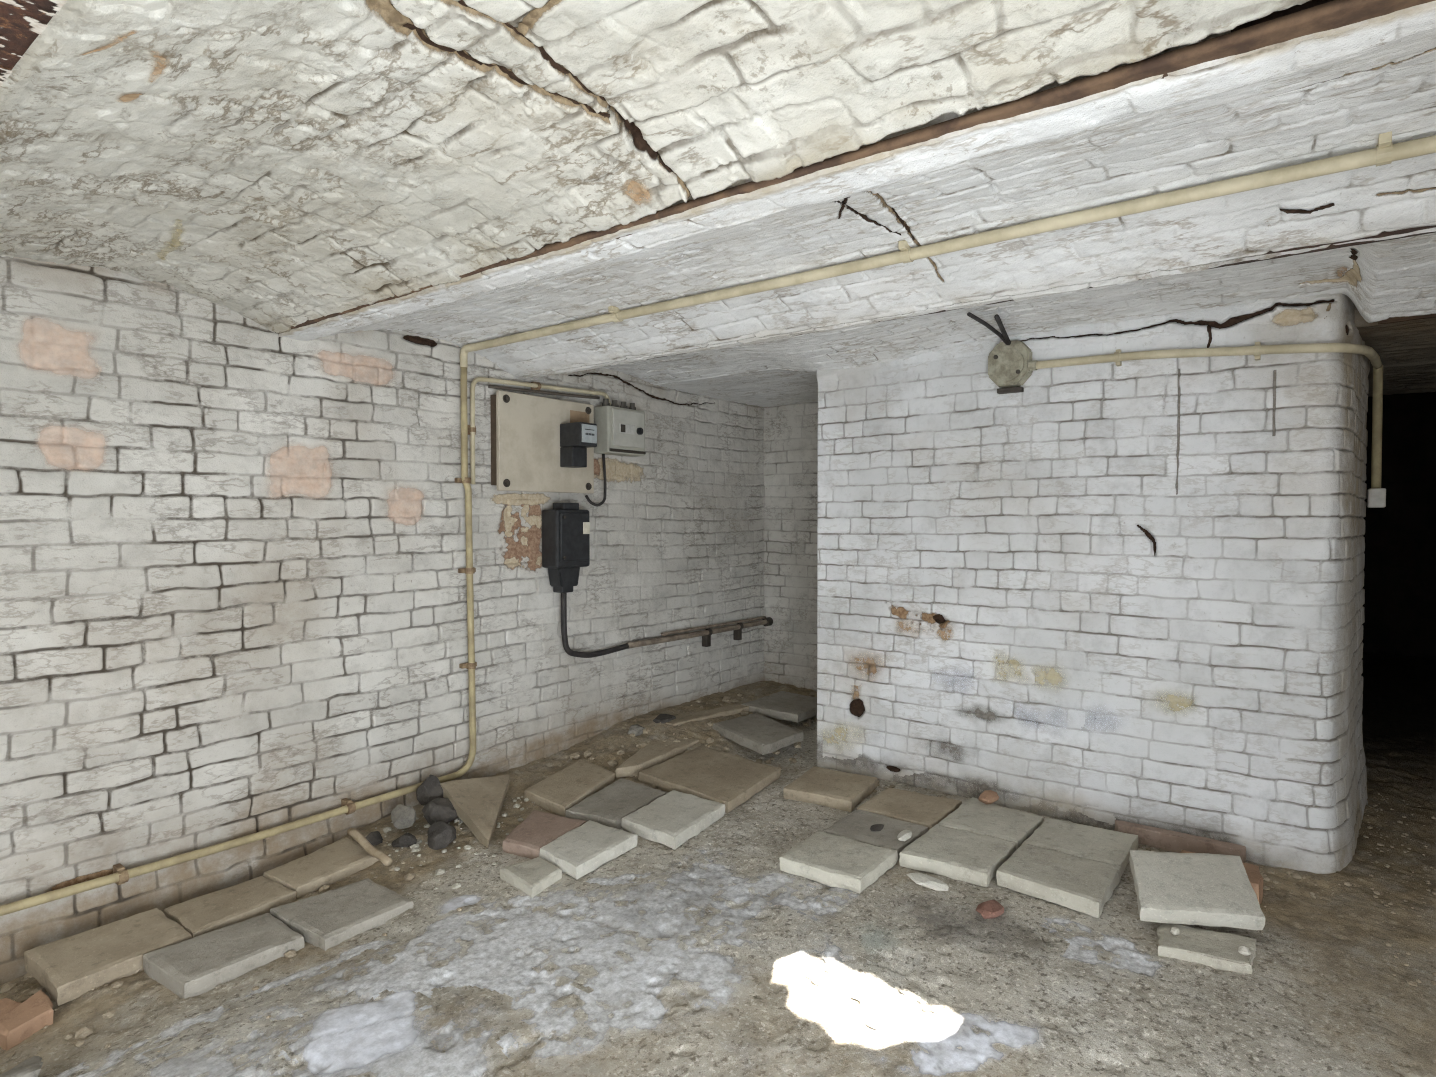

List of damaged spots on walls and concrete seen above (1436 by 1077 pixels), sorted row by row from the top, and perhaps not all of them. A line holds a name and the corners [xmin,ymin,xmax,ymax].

peeling [0,0,67,35]
peeling [0,36,23,87]
crack [1273,47,1436,96]
crack [365,0,691,199]
crack [1280,203,1335,214]
crack [1376,187,1436,196]
crack [834,191,944,282]
peeling [39,426,104,469]
peeling [271,446,331,498]
spalling [492,493,550,571]
crack [1137,525,1156,556]
spalling [886,602,951,641]